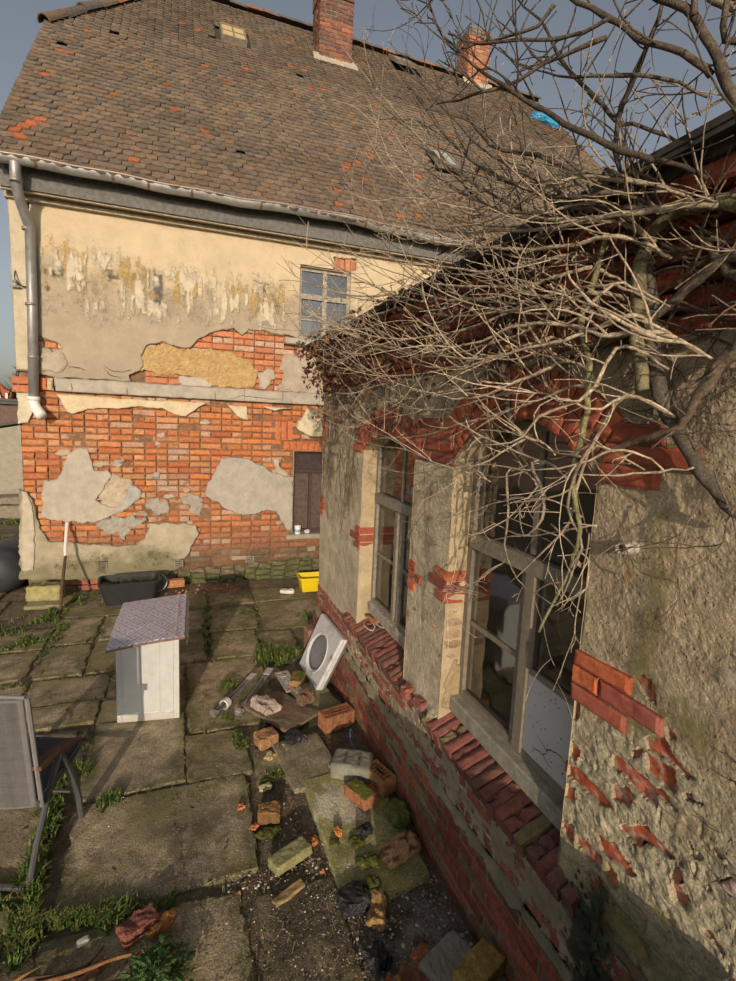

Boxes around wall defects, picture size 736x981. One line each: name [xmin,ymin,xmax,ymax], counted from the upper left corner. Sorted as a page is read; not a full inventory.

flaking render [38,337,62,349]
flaking render [140,329,321,394]
flaking render [11,376,324,563]
flaking render [638,674,657,703]
flaking render [565,730,697,808]
flaking render [622,824,690,907]
spalling [709,877,736,898]